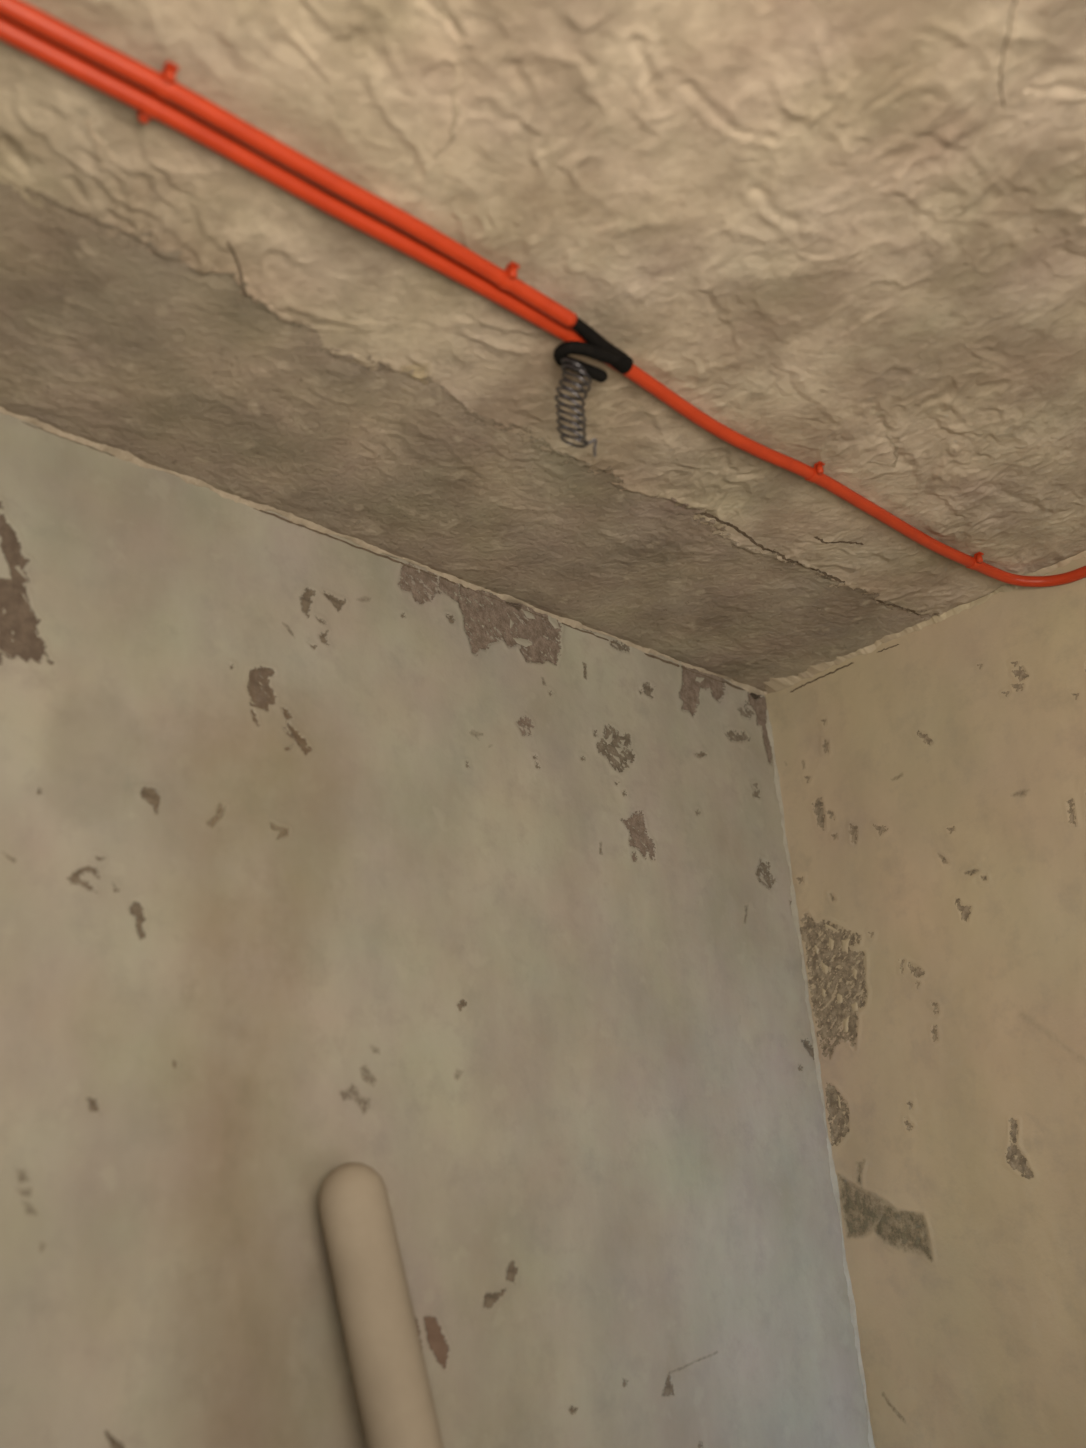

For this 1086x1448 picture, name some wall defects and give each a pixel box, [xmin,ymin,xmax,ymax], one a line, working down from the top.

crack [999,0,1017,107]
peeling [0,183,938,765]
crack [700,512,864,583]
crack [876,600,927,621]
crack [790,644,899,693]
peeling [581,725,635,796]
peeling [620,810,655,862]
peeling [798,913,874,1071]
peeling [1005,1118,1034,1179]